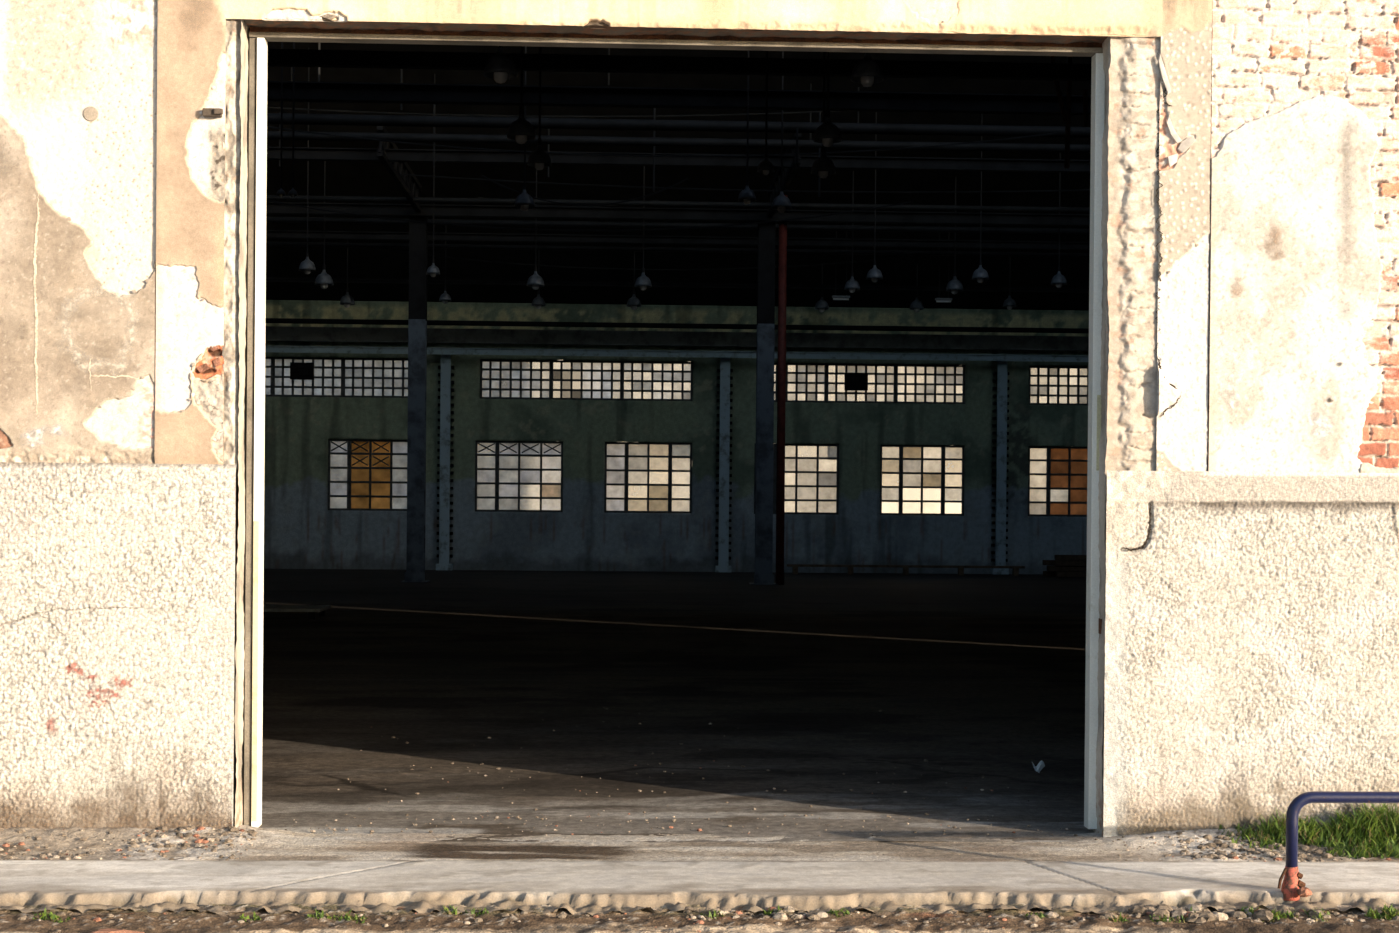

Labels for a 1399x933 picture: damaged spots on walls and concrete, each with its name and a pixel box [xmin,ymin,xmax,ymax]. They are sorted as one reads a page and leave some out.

spalling [1158,54,1196,172]
peeling [0,0,226,462]
peeling [1156,94,1399,473]
leakage [26,425,62,447]
crack [1124,504,1152,551]
crack [0,607,147,637]